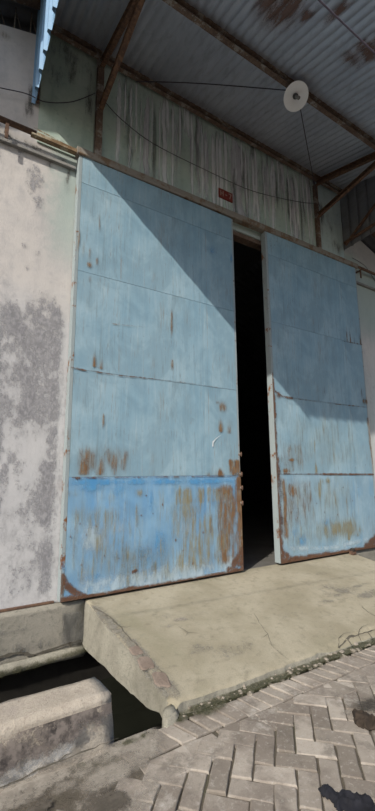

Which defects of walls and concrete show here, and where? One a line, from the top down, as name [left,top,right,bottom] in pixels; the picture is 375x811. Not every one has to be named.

corrosion [256,0,314,28]
corrosion [72,450,144,479]
corrosion [272,374,375,564]
corrosion [60,459,244,602]
crack [338,610,375,648]